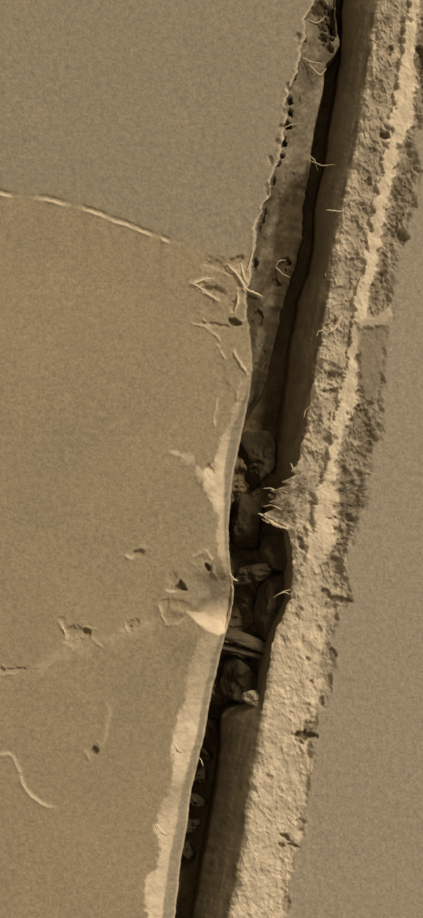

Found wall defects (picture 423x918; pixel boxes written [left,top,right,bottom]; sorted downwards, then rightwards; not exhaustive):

peeling [166,249,263,551]
crack [175,0,380,918]
spalling [229,0,423,918]